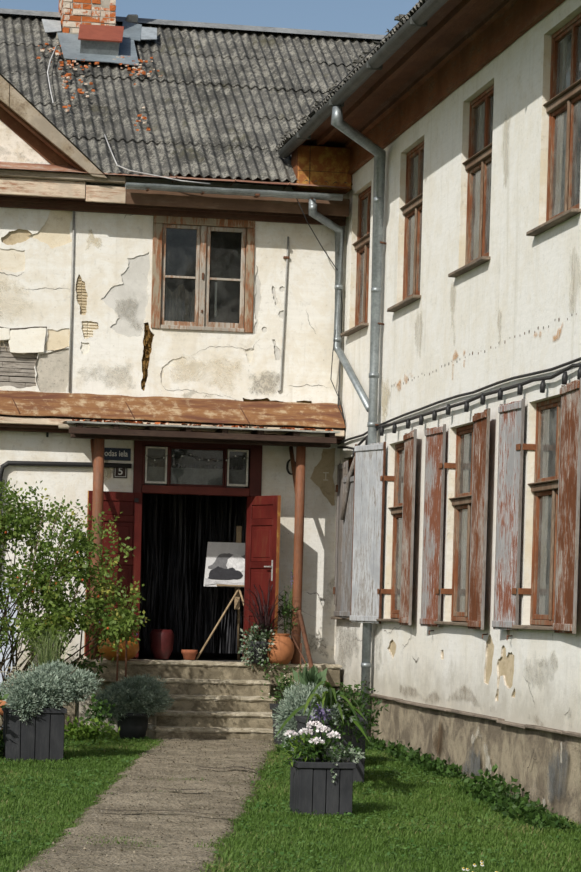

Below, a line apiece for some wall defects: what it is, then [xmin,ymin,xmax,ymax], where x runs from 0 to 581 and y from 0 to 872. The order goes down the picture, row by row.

peeling [0,210,72,272]
spalling [76,274,99,355]
peeling [101,252,154,390]
spalling [0,327,70,393]
peeling [161,356,187,378]
spalling [310,448,336,506]
spalling [387,639,396,659]
spalling [484,630,515,702]